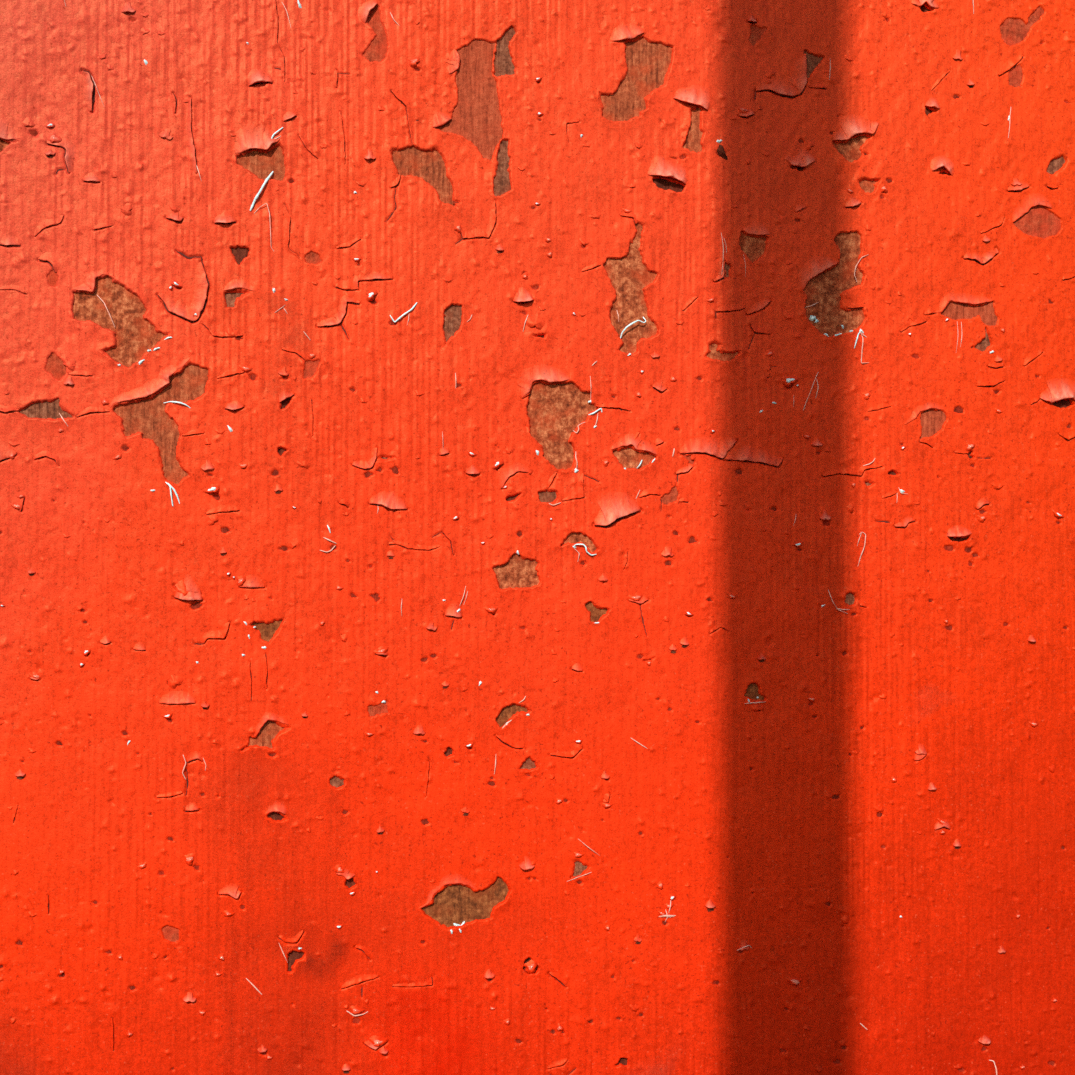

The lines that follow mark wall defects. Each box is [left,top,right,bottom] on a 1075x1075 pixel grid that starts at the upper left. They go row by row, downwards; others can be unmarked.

peeling [234,119,294,183]
peeling [392,147,459,207]
peeling [432,27,515,196]
peeling [601,23,672,121]
peeling [830,114,879,163]
peeling [72,270,172,367]
peeling [603,223,657,356]
peeling [797,232,866,337]
peeling [935,291,998,353]
peeling [109,357,208,484]
peeling [518,363,597,473]
peeling [419,873,509,934]